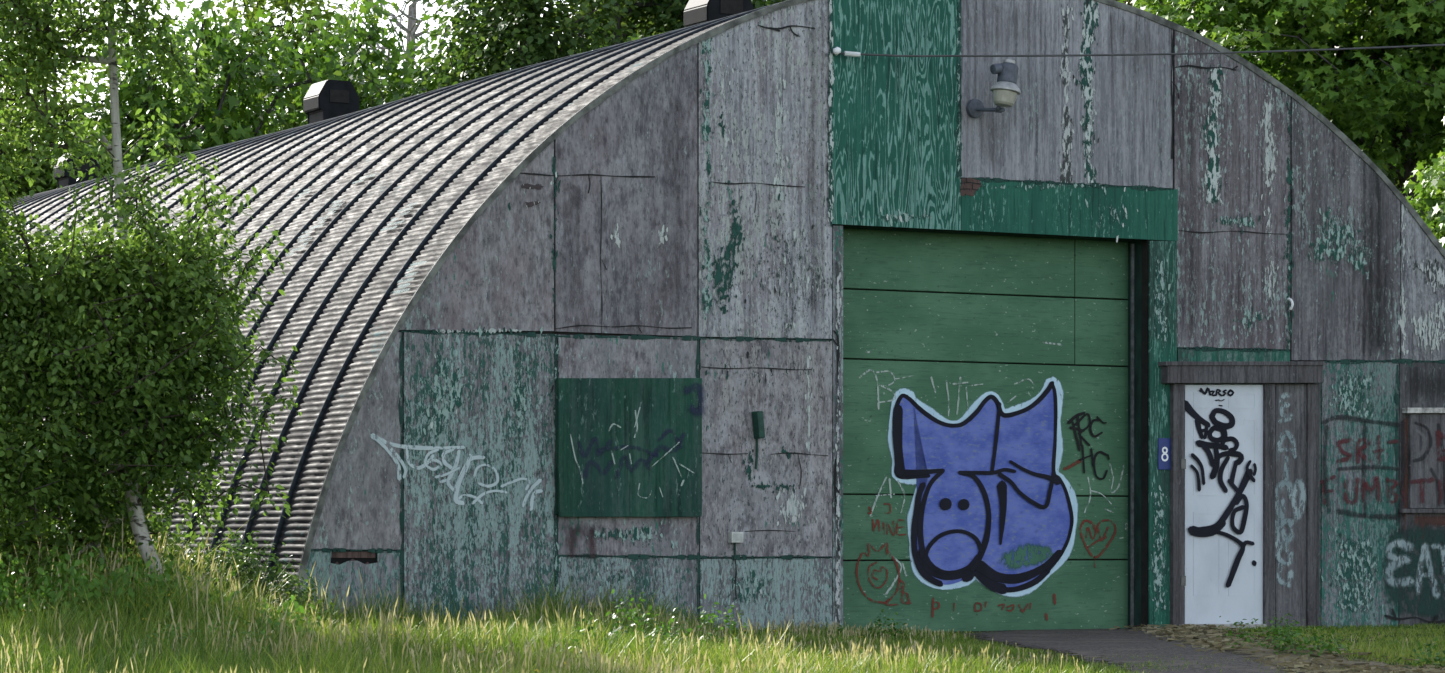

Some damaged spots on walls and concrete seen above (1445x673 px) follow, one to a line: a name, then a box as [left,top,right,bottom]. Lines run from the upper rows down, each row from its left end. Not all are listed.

peeling [423,326,543,450]
peeling [700,0,932,625]
peeling [955,0,1138,242]
peeling [1198,64,1377,353]
peeling [1323,371,1388,418]
peeling [1321,527,1383,617]